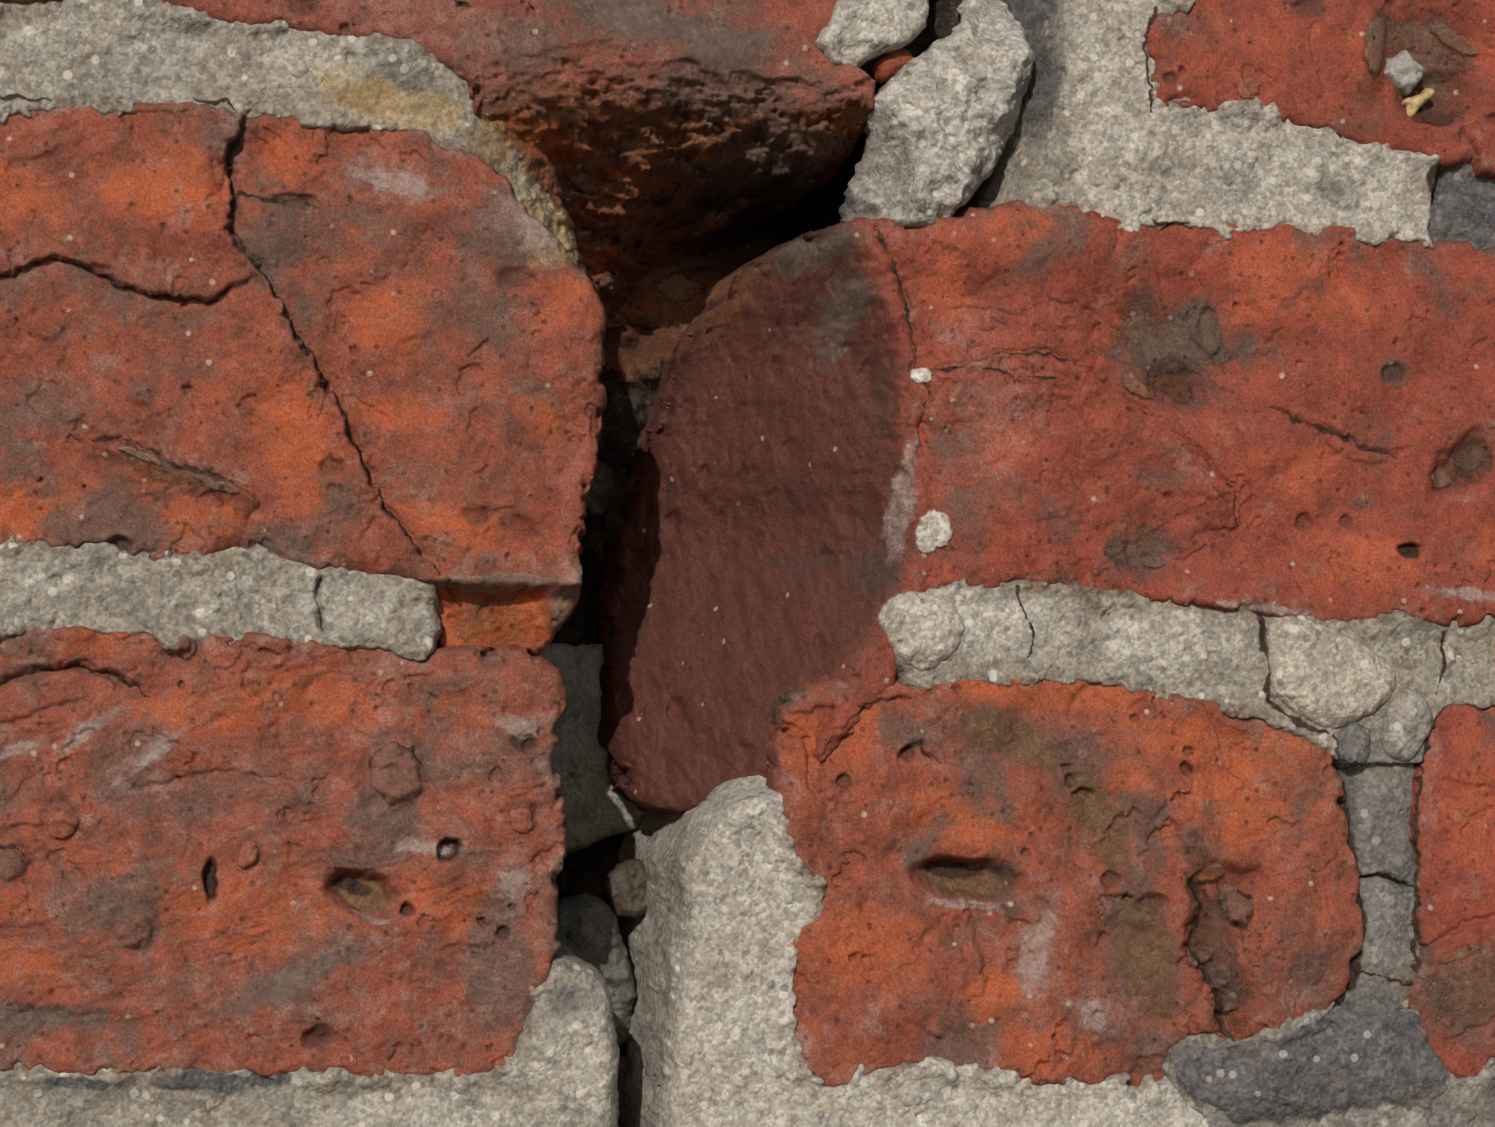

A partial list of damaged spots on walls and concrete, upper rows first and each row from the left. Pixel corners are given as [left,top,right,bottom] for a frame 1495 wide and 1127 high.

crack [0,93,51,102]
crack [866,69,887,96]
crack [903,0,963,58]
crack [1142,6,1158,113]
crack [1153,219,1189,227]
crack [769,132,1101,425]
crack [0,97,414,544]
crack [551,359,665,646]
crack [1016,584,1035,658]
crack [0,664,150,697]
crack [1187,602,1447,1049]
crack [555,833,625,913]